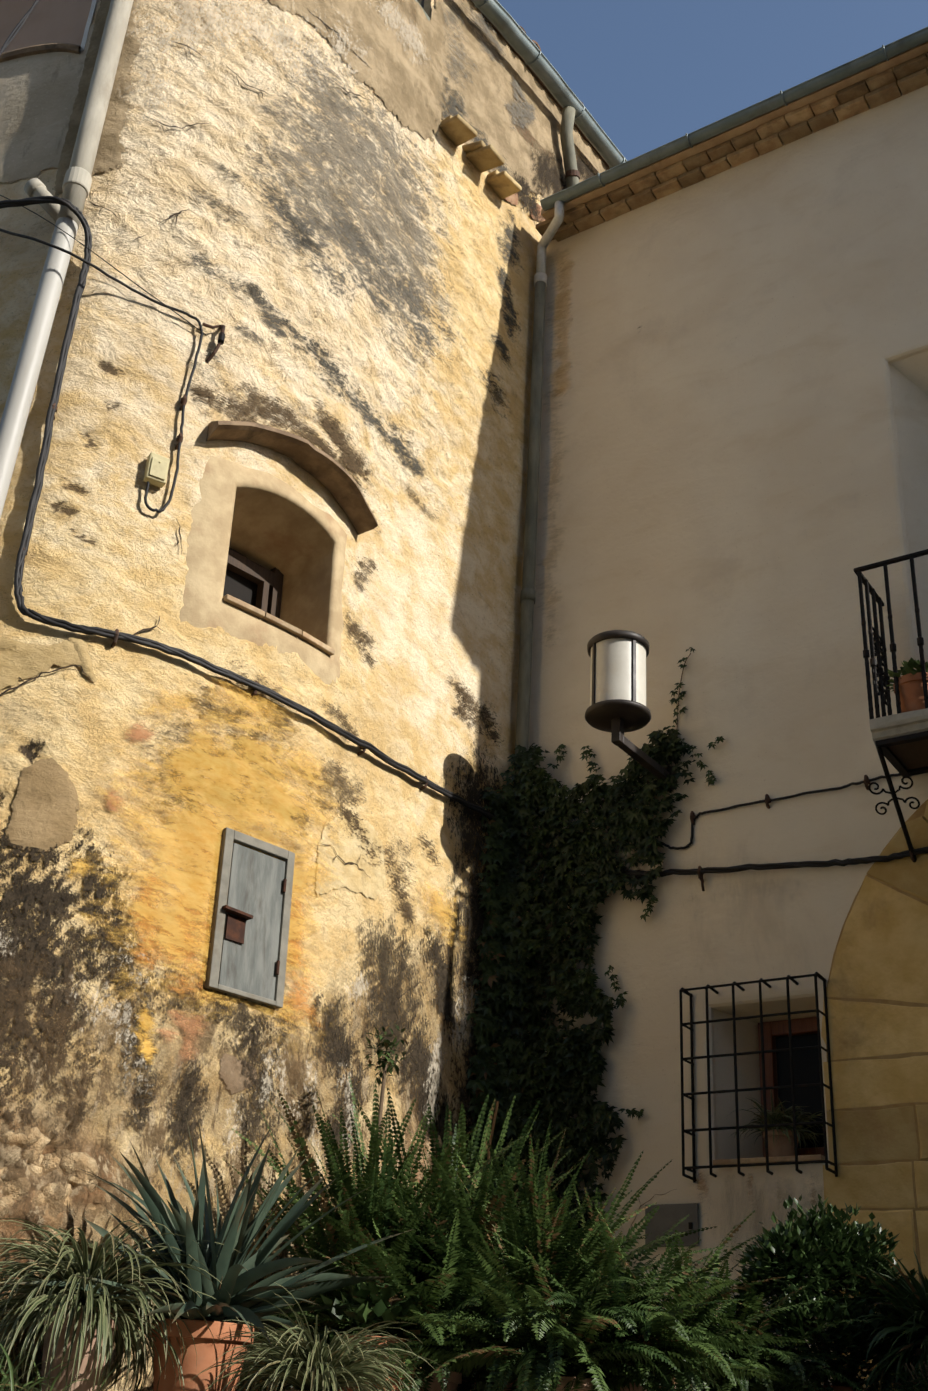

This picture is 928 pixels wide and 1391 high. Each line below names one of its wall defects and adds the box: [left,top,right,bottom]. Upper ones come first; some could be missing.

crack [164,37,272,98]
crack [307,8,371,102]
leakage [175,163,251,227]
leakage [245,144,444,360]
spalling [505,192,545,222]
spalling [97,360,125,377]
leakage [184,251,438,519]
peeling [0,637,98,690]
leakage [0,660,505,1182]
spalling [0,1117,111,1247]